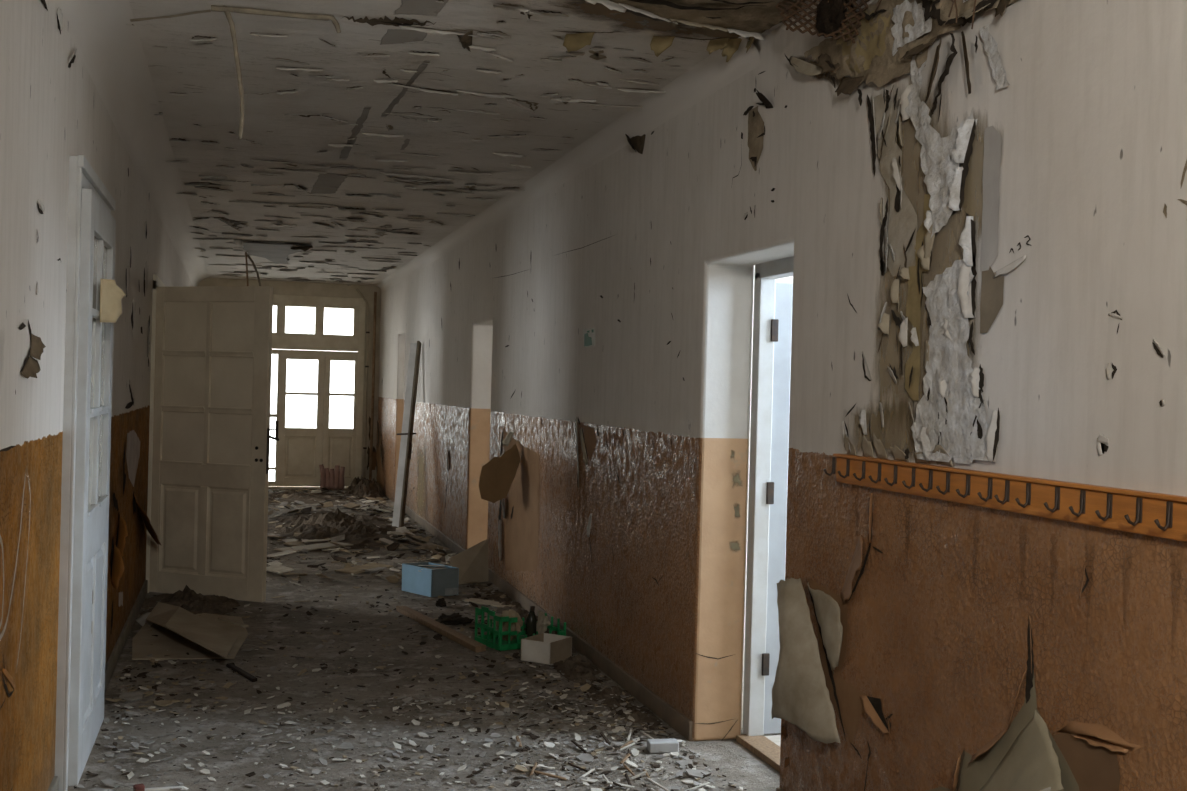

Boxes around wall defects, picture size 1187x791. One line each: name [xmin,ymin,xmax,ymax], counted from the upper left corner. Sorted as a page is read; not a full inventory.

peeling [41,0,63,34]
spalling [244,0,813,120]
peeling [169,106,525,286]
peeling [625,134,646,154]
spalling [731,88,787,188]
peeling [784,0,1026,467]
peeling [19,320,46,379]
peeling [478,429,540,572]
peeling [771,577,893,744]
peeling [926,620,1129,791]